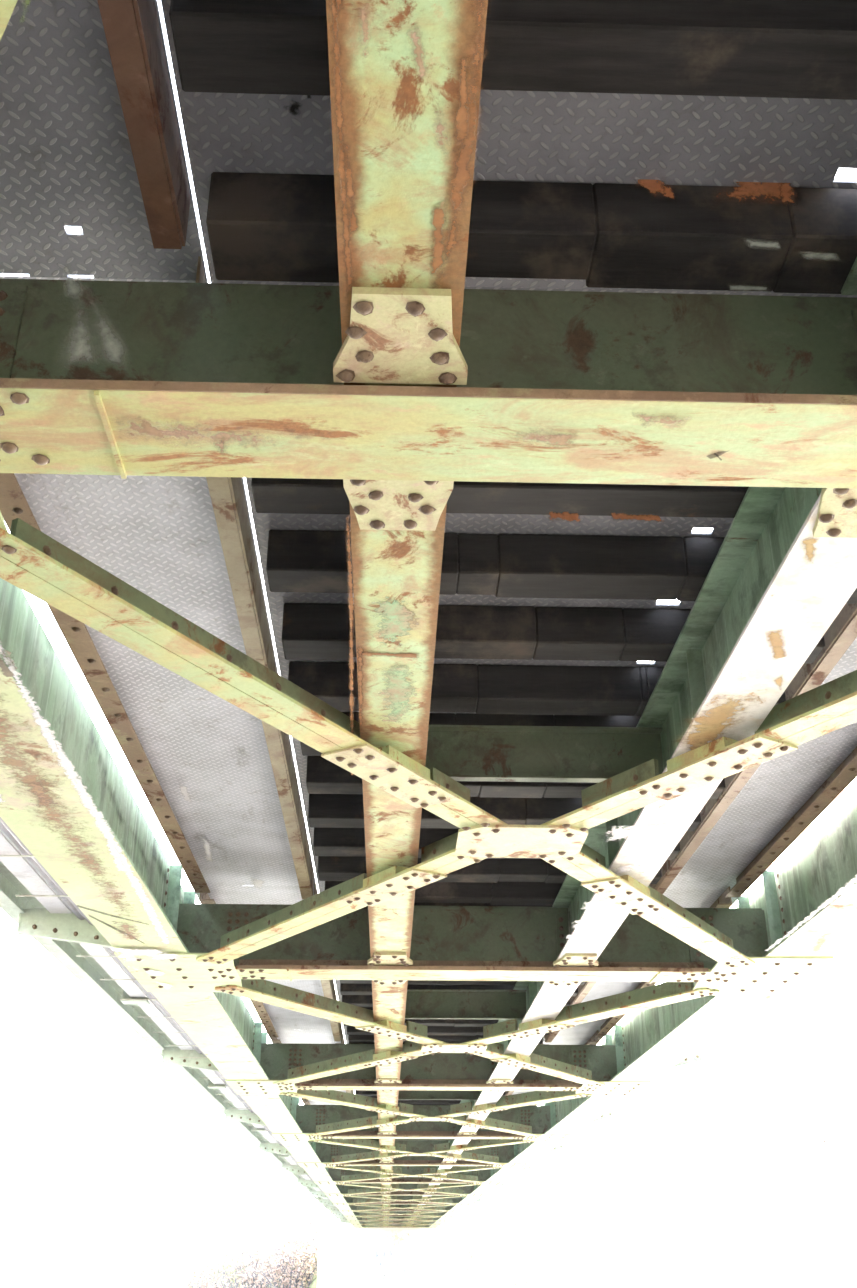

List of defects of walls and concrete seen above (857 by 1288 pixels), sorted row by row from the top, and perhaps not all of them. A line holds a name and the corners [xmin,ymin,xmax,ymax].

corrosion [330,0,358,291]
corrosion [431,0,485,284]
corrosion [638,179,674,198]
corrosion [717,182,794,203]
corrosion [129,420,261,452]
corrosion [0,715,136,939]